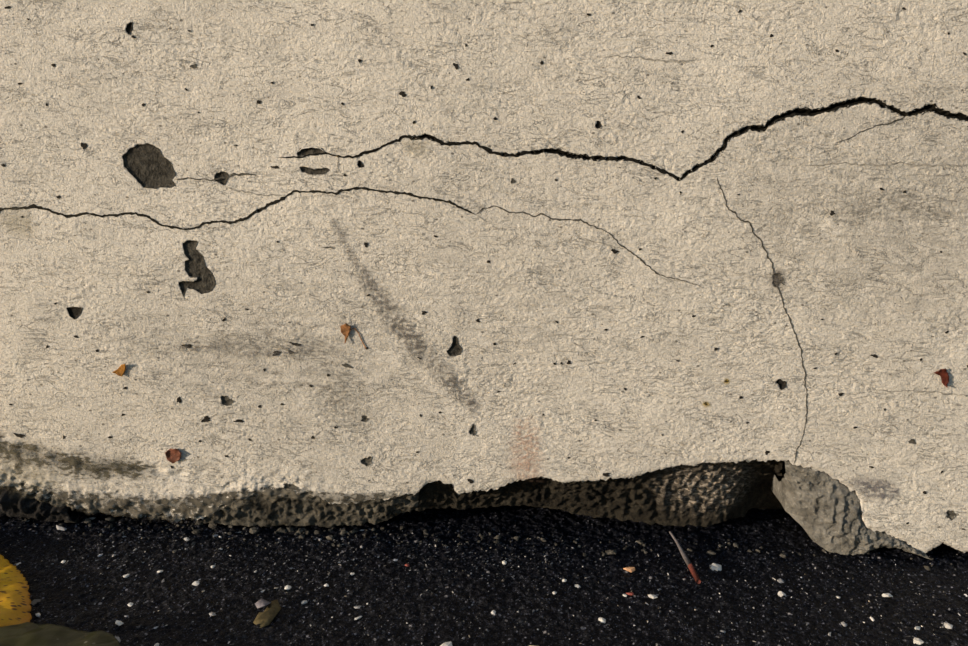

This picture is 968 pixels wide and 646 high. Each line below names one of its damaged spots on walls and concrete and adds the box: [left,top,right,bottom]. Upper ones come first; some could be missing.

peeling [122,143,175,189]
peeling [179,240,215,298]
crack [0,97,968,465]
spalling [0,451,929,559]